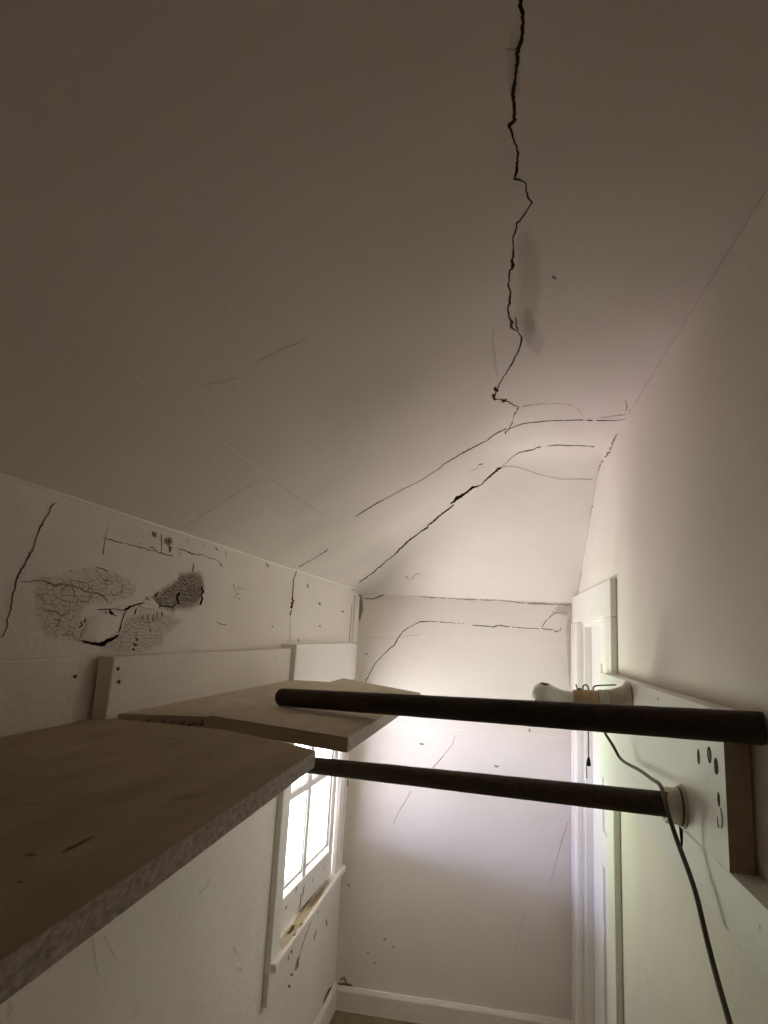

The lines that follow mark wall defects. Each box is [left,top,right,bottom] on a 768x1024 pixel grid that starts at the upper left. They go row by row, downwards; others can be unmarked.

crack [349,0,766,682]
crack [2,503,243,653]
crack [289,550,327,641]